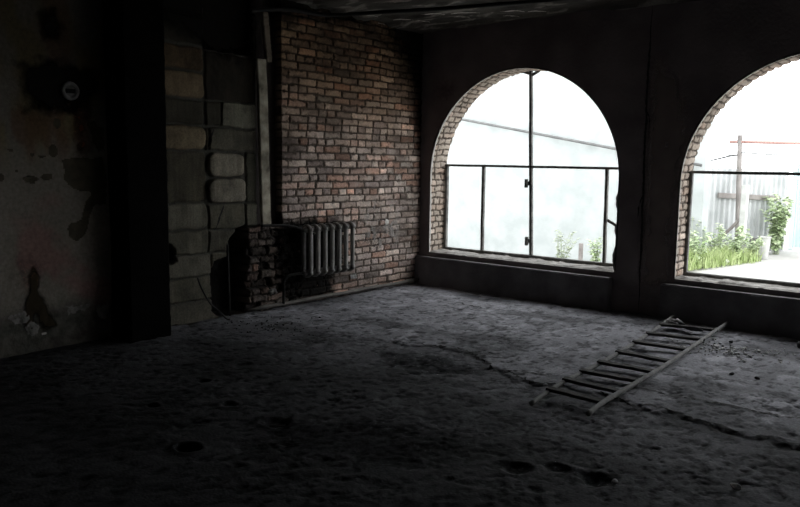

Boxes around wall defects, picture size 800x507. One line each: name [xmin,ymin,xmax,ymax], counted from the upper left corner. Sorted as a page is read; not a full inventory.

peeling [30,144,107,241]
crack [591,377,800,446]